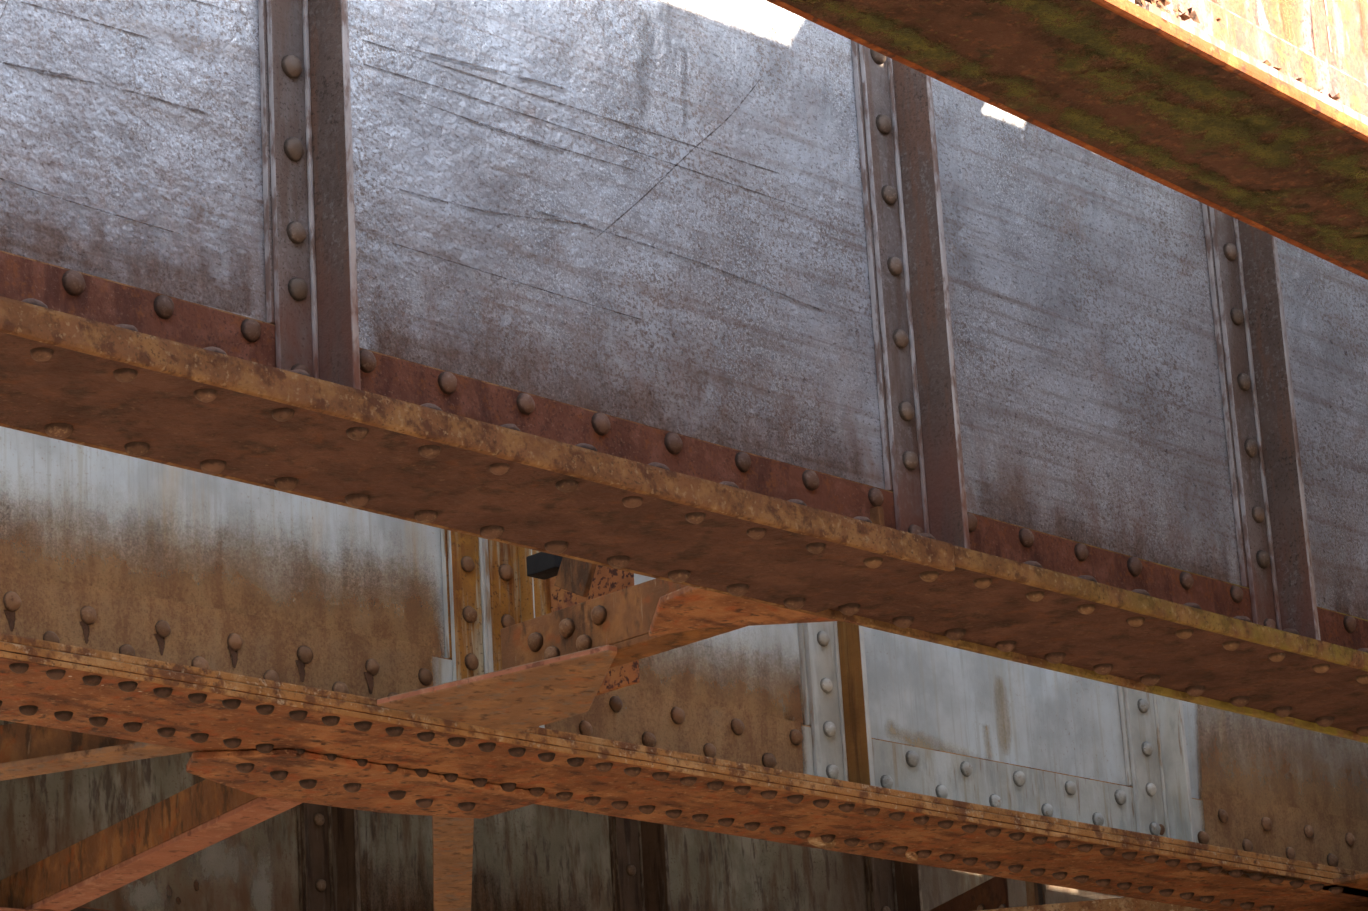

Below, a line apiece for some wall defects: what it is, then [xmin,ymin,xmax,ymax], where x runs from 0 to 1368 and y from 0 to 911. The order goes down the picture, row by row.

rust [0,514,444,699]
rust [544,655,805,774]